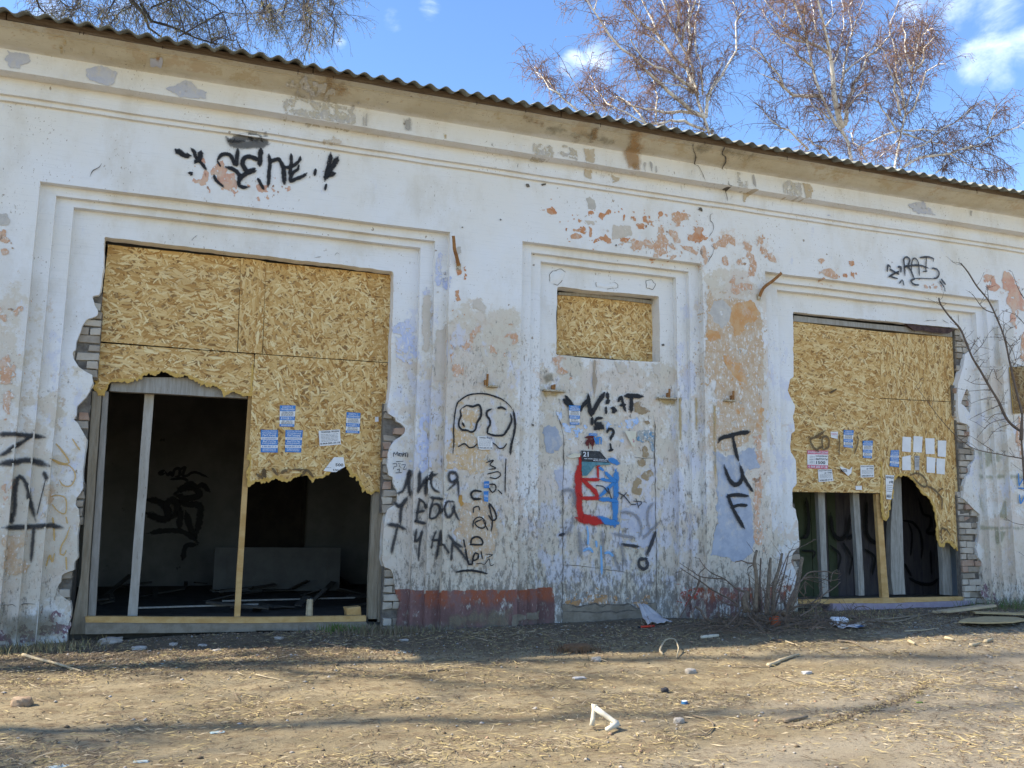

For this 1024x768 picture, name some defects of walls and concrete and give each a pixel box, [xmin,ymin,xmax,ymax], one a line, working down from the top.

flaking render [73,293,103,440]
peeling [540,196,776,552]
peeling [818,252,857,286]
flaking render [952,329,968,371]
peeling [983,268,1024,361]
flaking render [76,482,86,525]
flaking render [950,385,998,606]
flaking render [380,566,400,629]